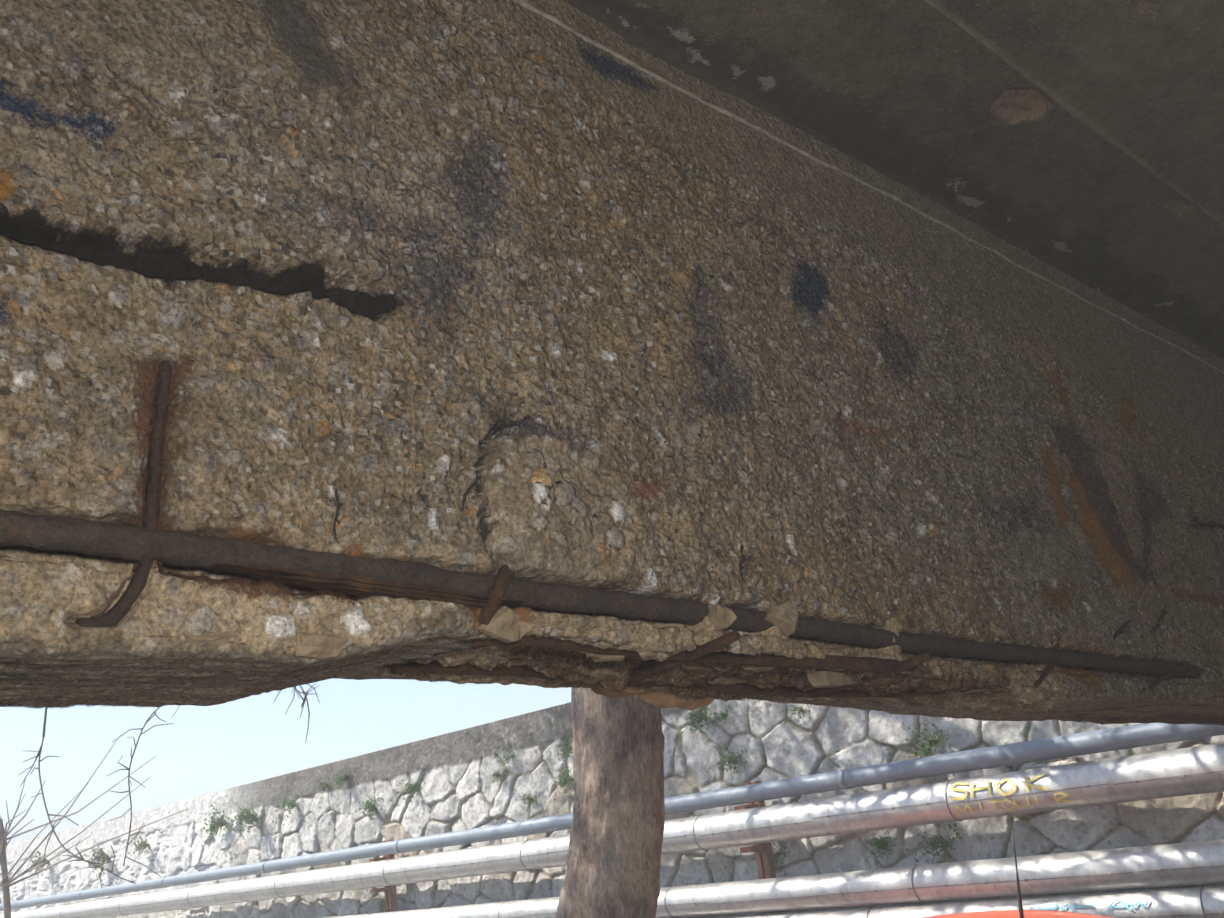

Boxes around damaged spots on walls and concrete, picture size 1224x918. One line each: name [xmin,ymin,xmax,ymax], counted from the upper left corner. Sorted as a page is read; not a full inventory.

rust [123,354,201,533]
rust [150,557,370,599]
crack [462,421,517,576]
spalling [0,360,1205,712]
rust [496,646,1013,702]